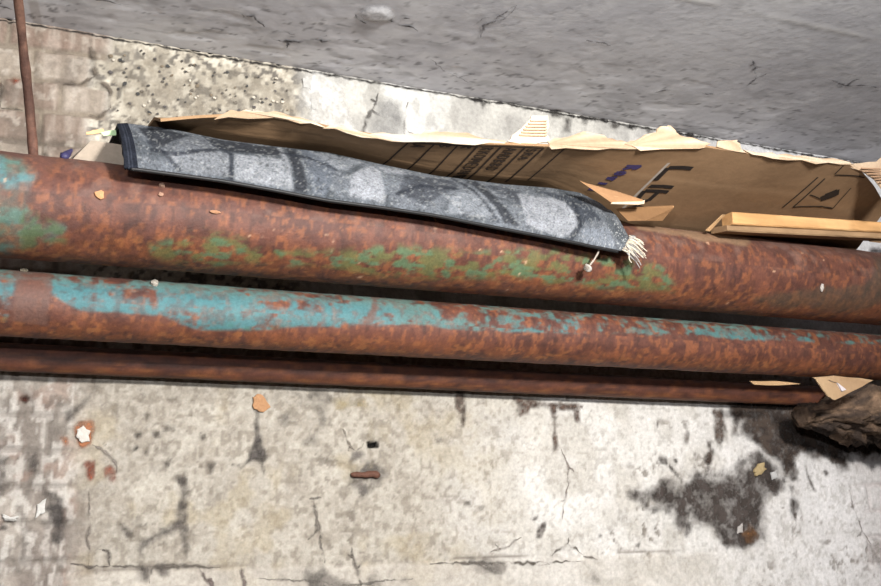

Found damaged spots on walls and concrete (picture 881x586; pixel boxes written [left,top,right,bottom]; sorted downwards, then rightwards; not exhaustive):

crack [0,3,860,164]
damp [630,403,881,547]